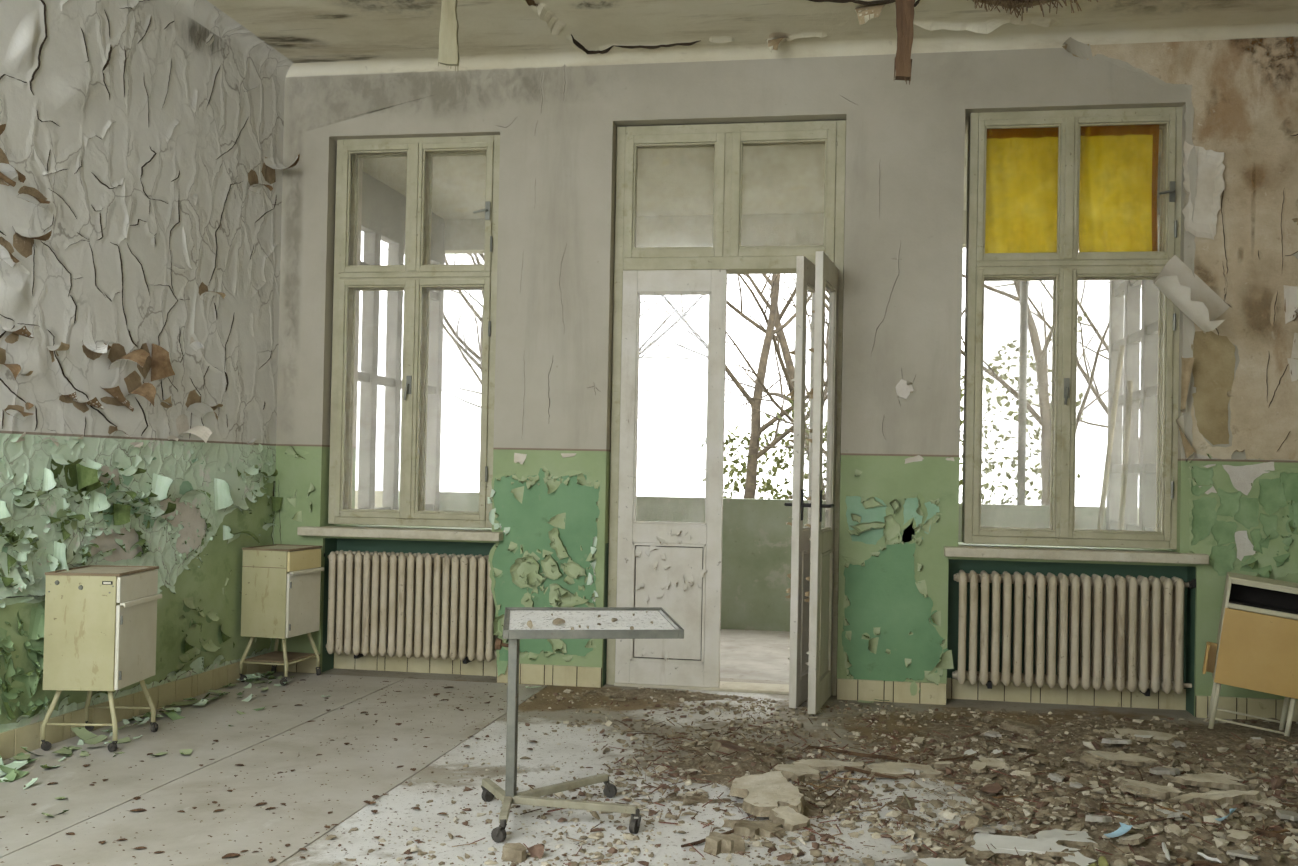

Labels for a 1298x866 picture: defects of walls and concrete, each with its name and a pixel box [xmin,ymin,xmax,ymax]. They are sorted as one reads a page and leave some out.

crack [525,0,1064,54]
peeling [0,124,50,208]
peeling [0,226,52,268]
crack [0,0,281,439]
peeling [248,154,300,194]
flaking render [1062,37,1298,581]
crack [1220,175,1232,301]
crack [1279,188,1287,274]
crack [1265,351,1292,452]
peeling [0,325,315,729]
peeling [487,453,604,677]
peeling [838,469,954,696]